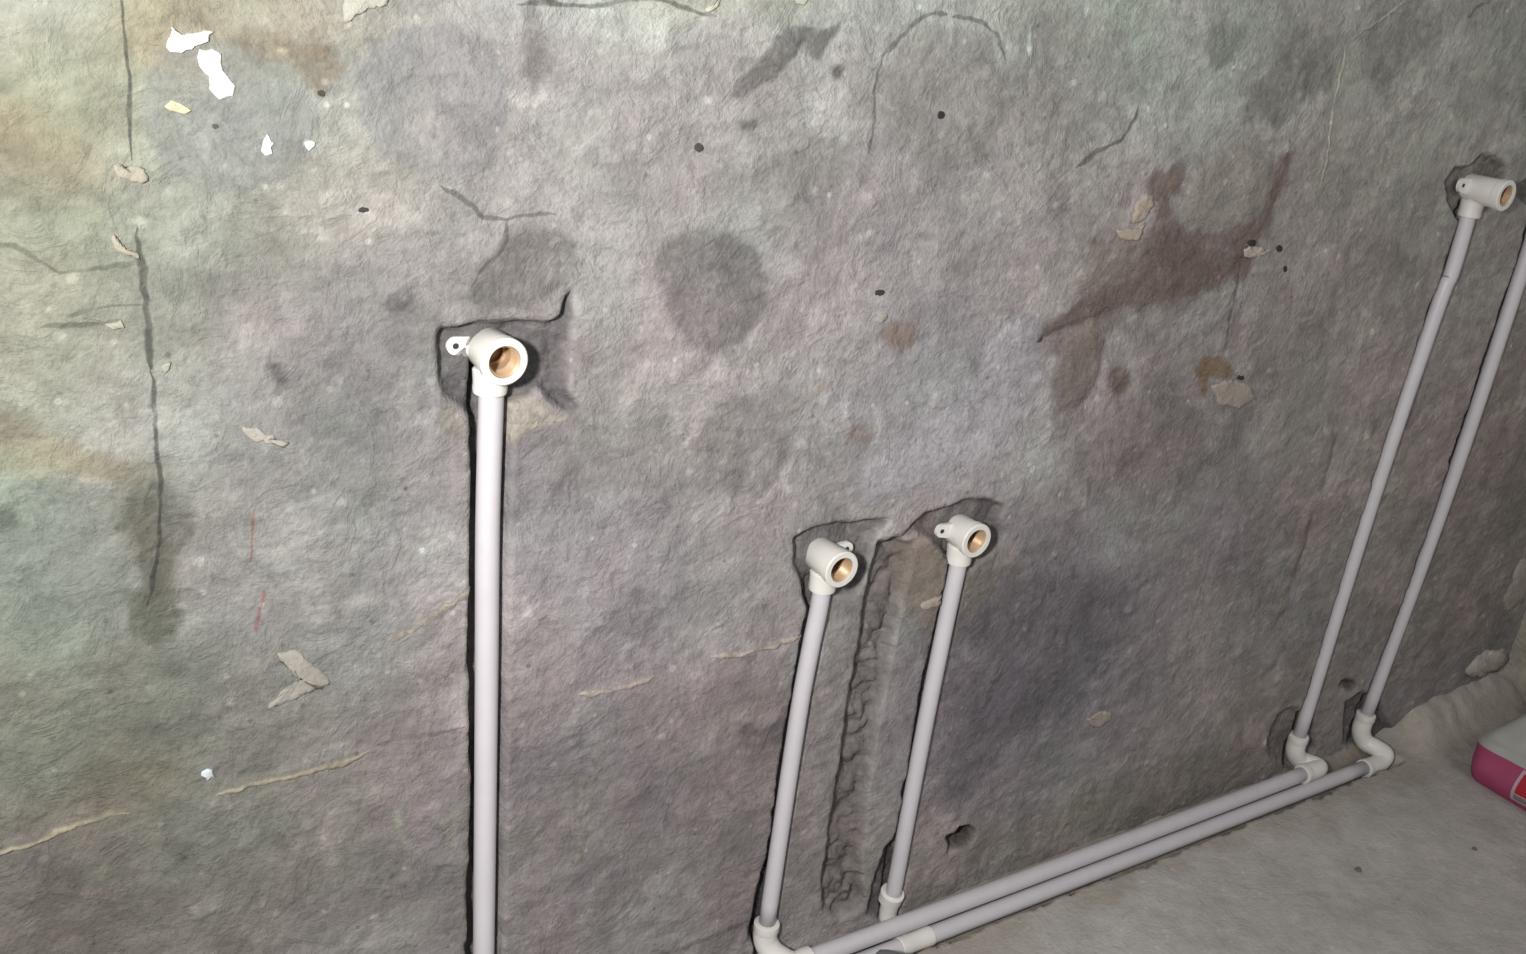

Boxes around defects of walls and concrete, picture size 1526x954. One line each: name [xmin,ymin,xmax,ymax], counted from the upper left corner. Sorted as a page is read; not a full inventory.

crack [124,55,132,152]
flaking render [166,27,235,99]
damp [735,27,836,95]
crack [138,248,163,595]
damp [753,156,1526,954]